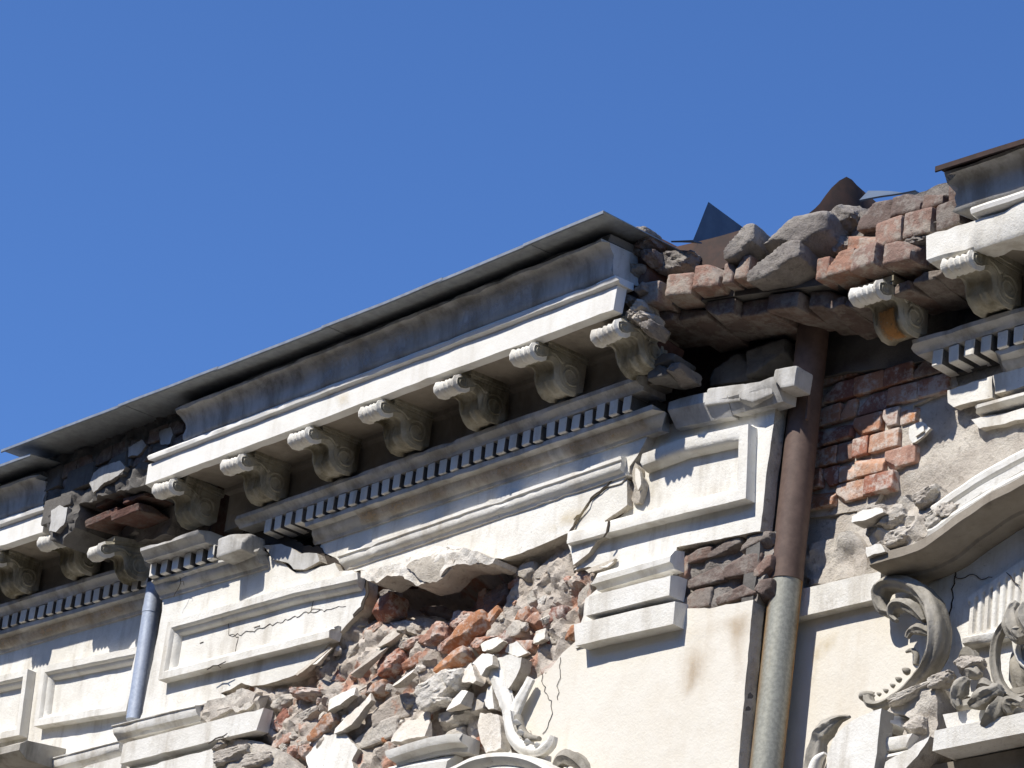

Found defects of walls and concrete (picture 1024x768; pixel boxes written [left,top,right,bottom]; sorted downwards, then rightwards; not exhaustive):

spalling [625,183,973,390]
spalling [39,414,210,554]
crack [201,531,369,670]
spalling [200,541,618,768]
crack [569,481,624,537]
spalling [677,531,777,621]
spalling [802,361,960,589]
crack [949,572,1020,616]